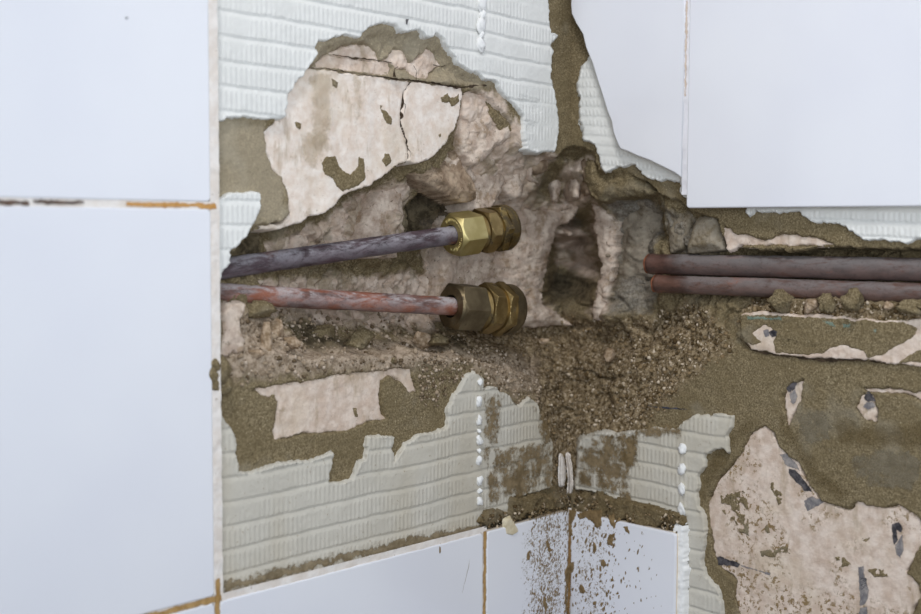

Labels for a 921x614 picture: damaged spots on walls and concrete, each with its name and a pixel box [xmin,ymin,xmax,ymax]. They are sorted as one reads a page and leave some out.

crack [310,54,487,162]
spalling [249,44,462,234]
spalling [724,227,834,253]
spalling [220,300,245,357]
spalling [255,368,416,440]
spalling [785,381,804,425]
spalling [857,388,921,422]
peeling [502,516,518,535]
spalling [709,426,921,614]